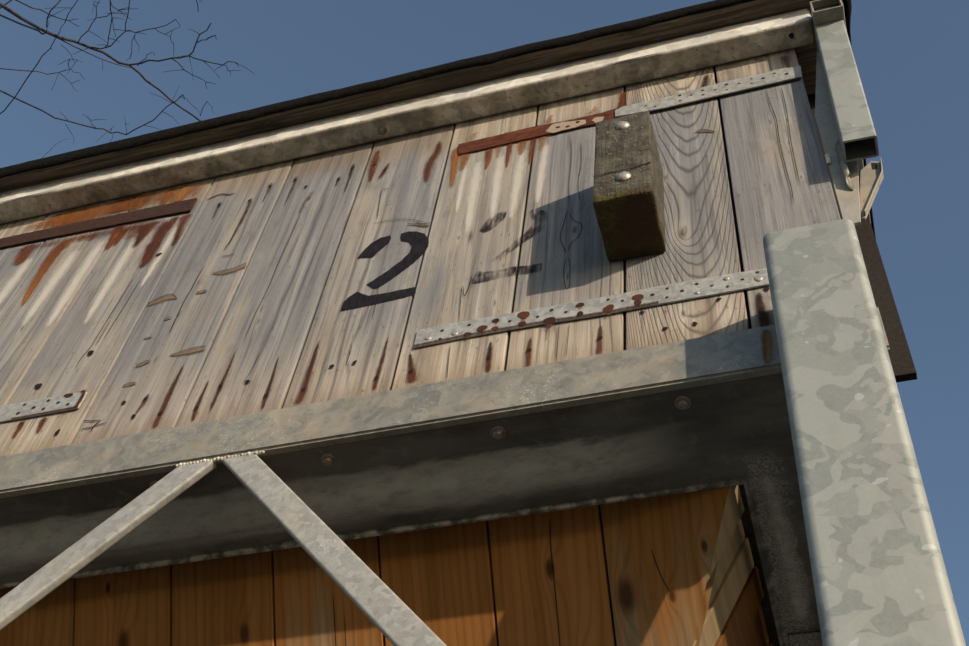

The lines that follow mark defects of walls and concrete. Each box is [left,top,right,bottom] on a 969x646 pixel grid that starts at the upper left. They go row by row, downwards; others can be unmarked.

rust [451,148,469,186]
rust [485,136,545,168]
rust [35,185,198,228]
rust [14,214,190,304]
rust [153,366,183,428]
rust [192,353,235,420]
rust [262,359,278,408]
rust [296,342,319,403]
rust [373,339,388,389]
rust [407,294,659,382]
rust [756,293,772,362]